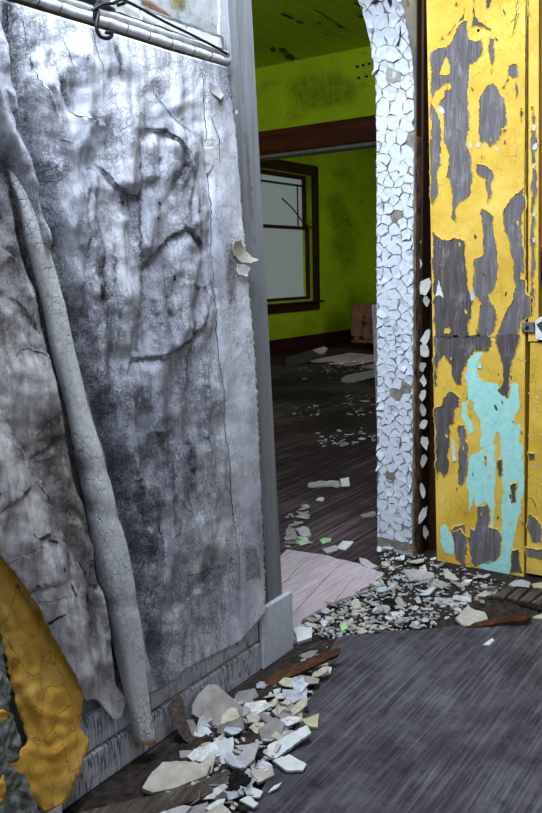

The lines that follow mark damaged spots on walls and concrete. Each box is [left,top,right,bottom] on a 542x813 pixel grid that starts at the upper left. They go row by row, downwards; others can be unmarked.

crack [9,297,51,359]
crack [0,407,67,513]
crack [86,163,143,218]
crack [125,23,240,581]
crack [314,0,415,552]
peeling [418,0,542,574]